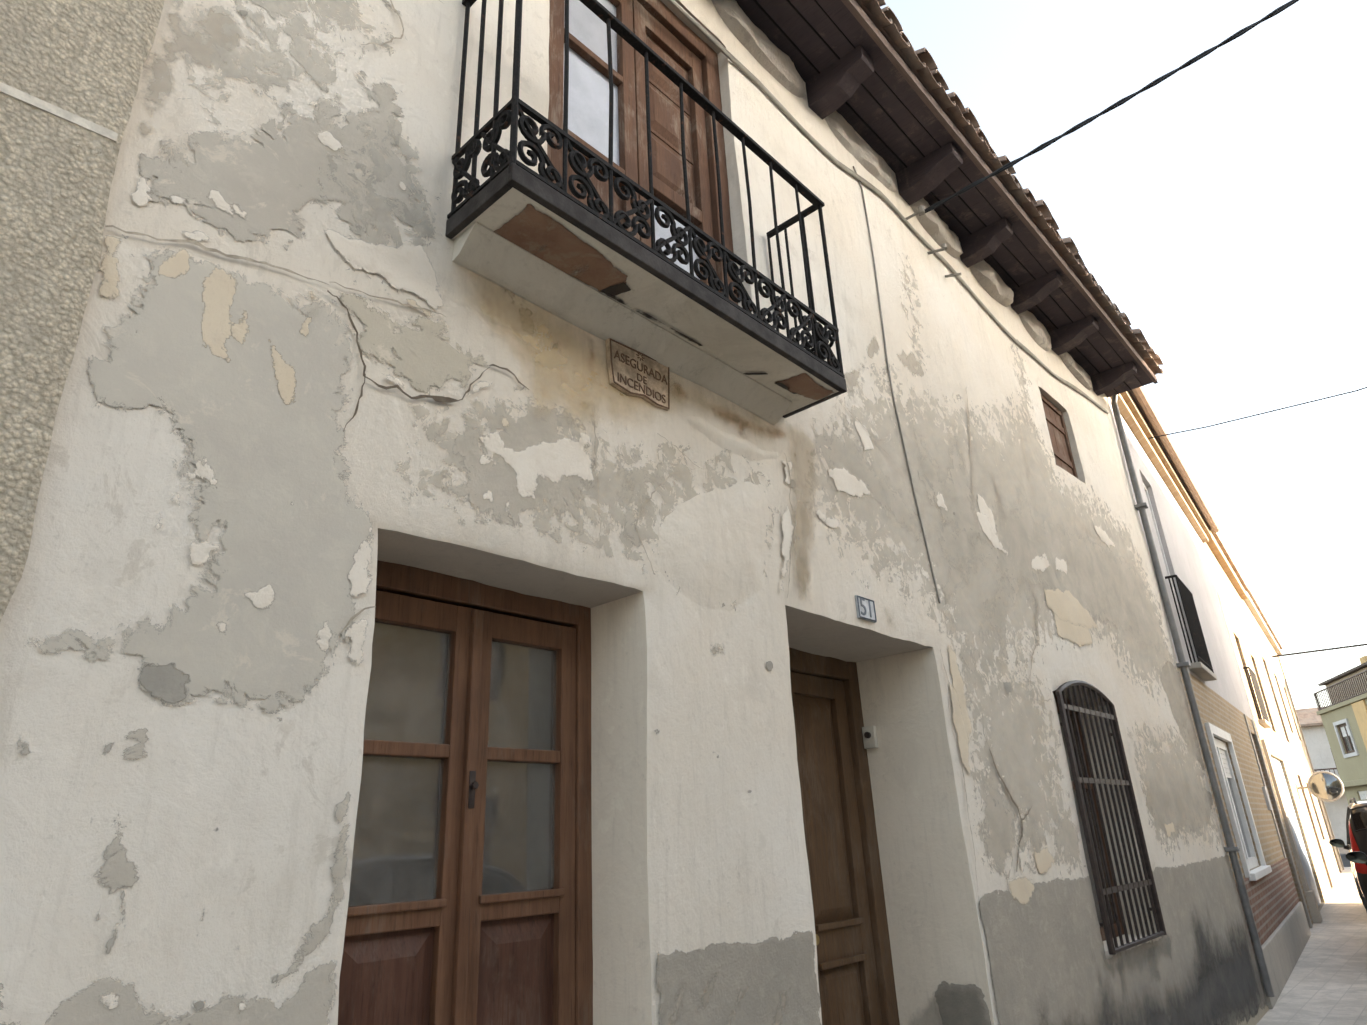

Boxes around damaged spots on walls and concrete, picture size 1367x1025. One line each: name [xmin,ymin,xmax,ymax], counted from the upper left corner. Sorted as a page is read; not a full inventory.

peeling [29,71,486,721]
crack [105,225,529,432]
peeling [424,397,594,543]
spalling [775,373,834,400]
peeling [813,419,1171,661]
peeling [104,728,148,760]
crack [940,649,1032,887]
spalling [45,792,351,1025]
spalling [1009,877,1034,905]
water stain [1102,925,1260,1025]